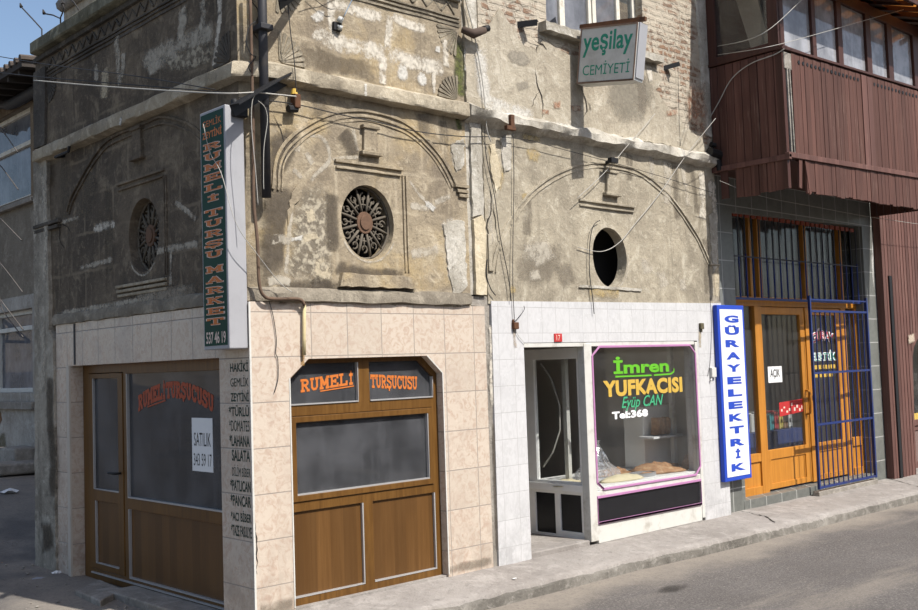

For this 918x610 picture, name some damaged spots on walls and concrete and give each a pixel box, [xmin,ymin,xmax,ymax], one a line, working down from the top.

crack [532,41,546,118]
flaking render [687,87,707,131]
flaking render [487,134,512,240]
flaking render [442,220,468,293]